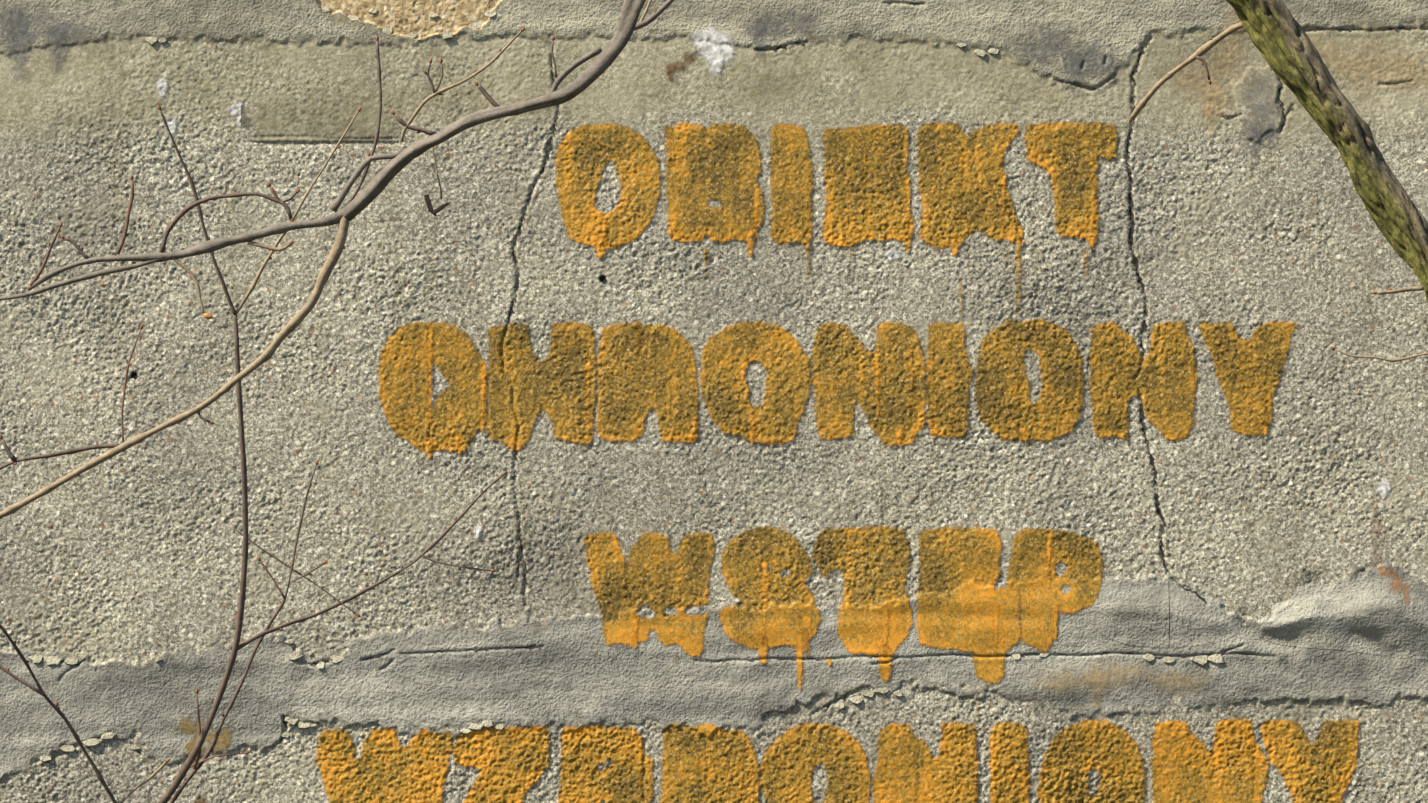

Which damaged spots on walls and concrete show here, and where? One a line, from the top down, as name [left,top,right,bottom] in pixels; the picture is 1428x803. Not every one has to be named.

crack [507,55,559,323]
crack [1055,39,1207,604]
crack [512,416,527,603]